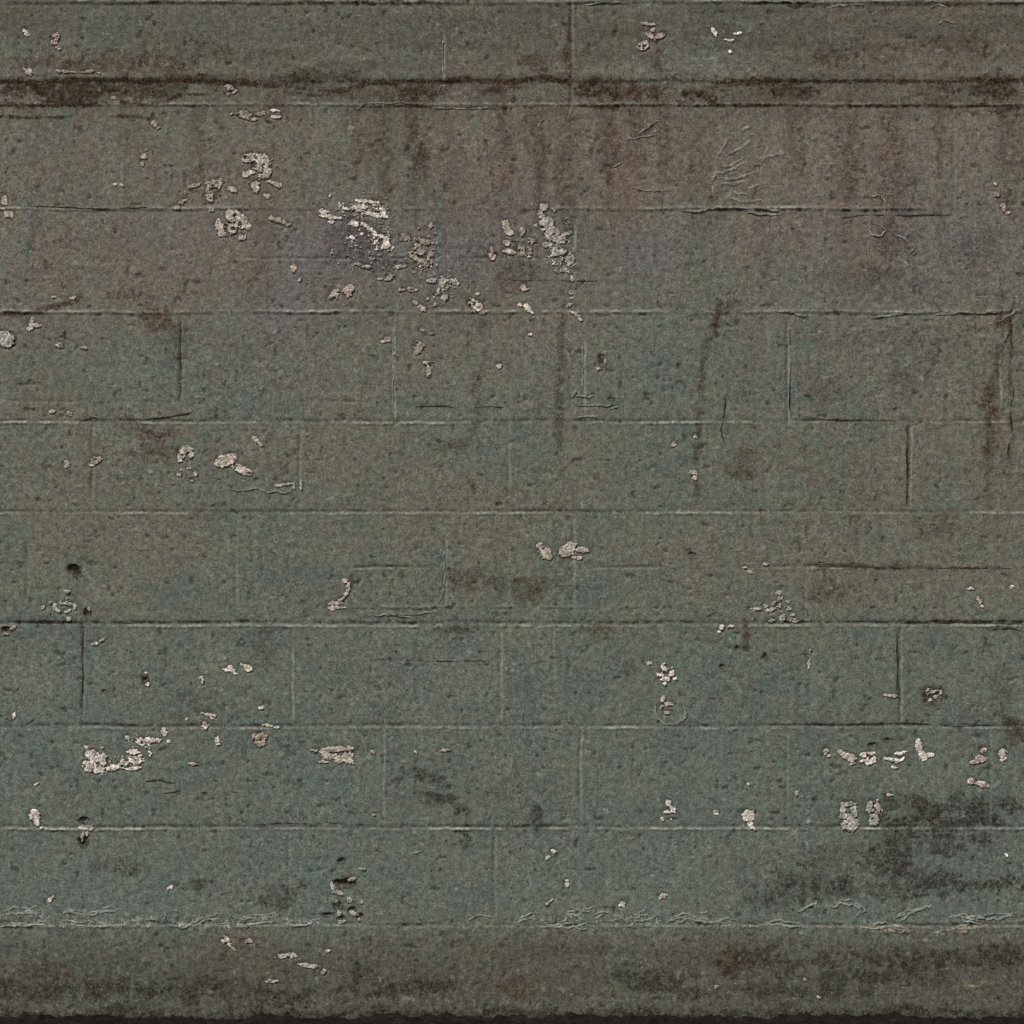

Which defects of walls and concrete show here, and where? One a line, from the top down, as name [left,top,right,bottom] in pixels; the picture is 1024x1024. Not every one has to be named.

peeling [172,146,285,241]
peeling [319,190,487,316]
peeling [487,204,583,322]
peeling [177,445,198,483]
peeling [214,453,253,476]
peeling [536,541,589,560]
peeling [748,591,800,624]
peeling [646,661,678,714]
peeling [81,727,172,778]
peeling [823,738,935,769]
peeling [839,793,894,833]
spalling [322,868,367,925]